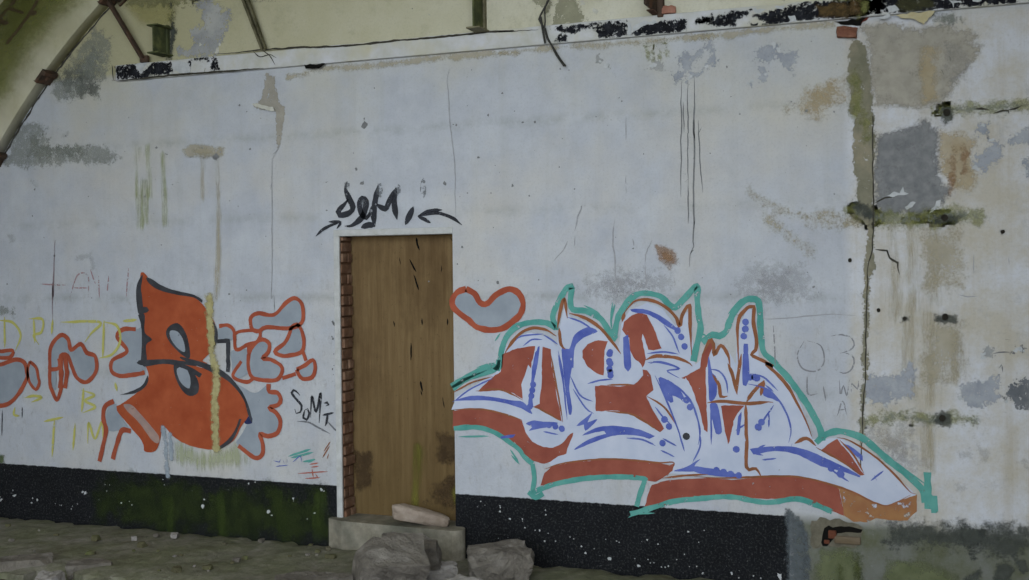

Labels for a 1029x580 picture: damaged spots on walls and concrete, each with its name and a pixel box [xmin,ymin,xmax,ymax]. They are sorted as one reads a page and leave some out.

peeling [533,0,1016,124]
crack [773,40,900,465]
leakage [882,520,1029,580]